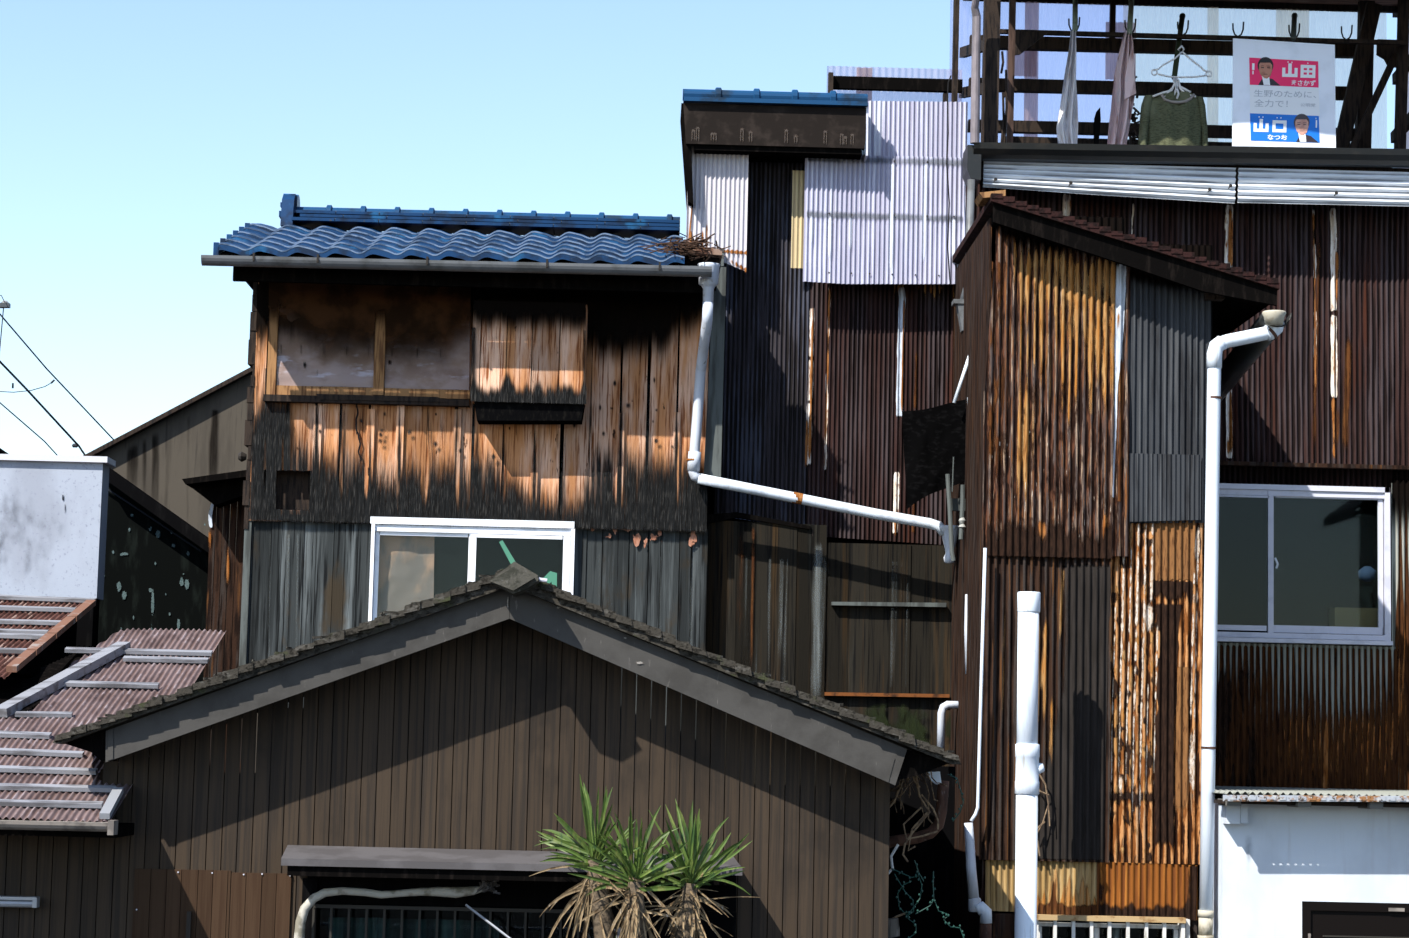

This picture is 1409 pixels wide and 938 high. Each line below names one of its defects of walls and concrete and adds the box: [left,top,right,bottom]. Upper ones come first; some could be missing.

rust [988,242,1120,525]
rust [1336,341,1351,446]
rust [1038,521,1046,540]
rust [1109,631,1154,853]
rust [1130,520,1195,596]
rust [1215,480,1409,790]